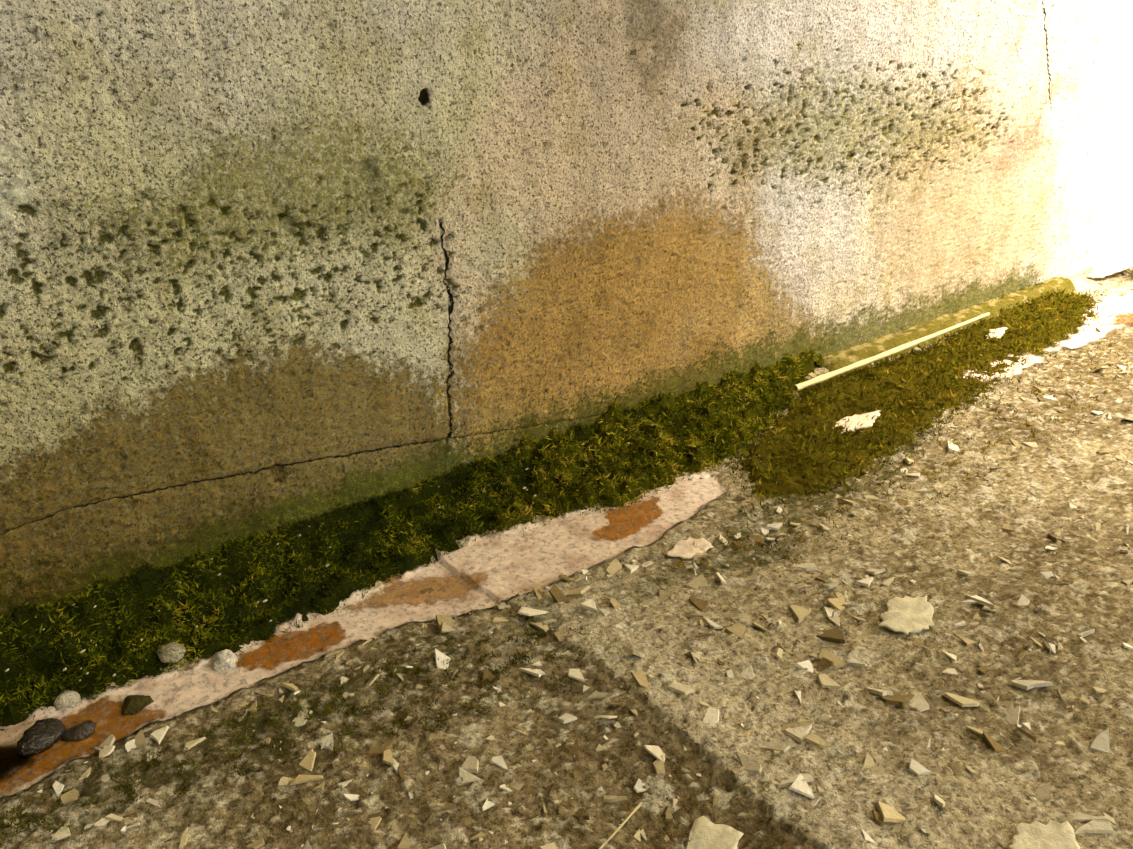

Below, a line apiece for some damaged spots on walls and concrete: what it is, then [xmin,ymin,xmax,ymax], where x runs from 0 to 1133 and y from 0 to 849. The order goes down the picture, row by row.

damp [880,88,1069,313]
crack [2,221,588,535]
damp [0,174,829,617]